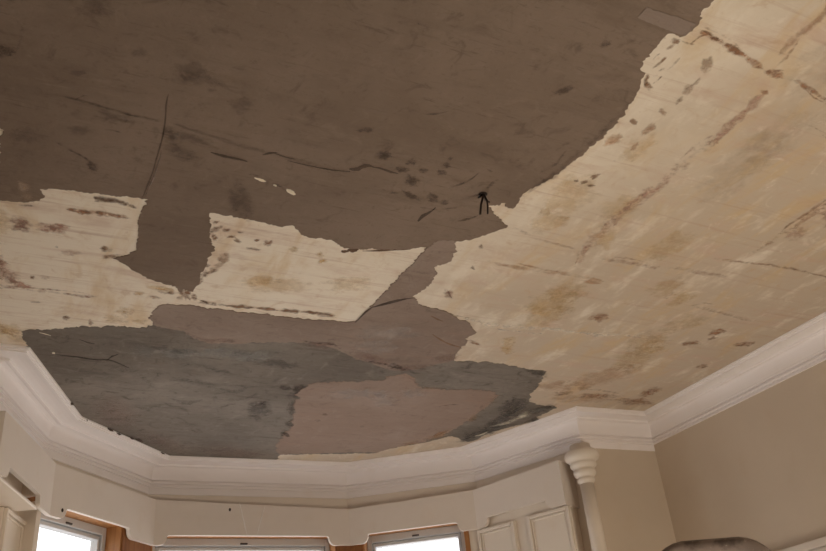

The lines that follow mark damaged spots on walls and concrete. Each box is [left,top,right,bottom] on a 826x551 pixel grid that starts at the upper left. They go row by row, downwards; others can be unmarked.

water stain [69,197,134,218]
peeling [227,305,333,317]
crack [55,339,128,368]